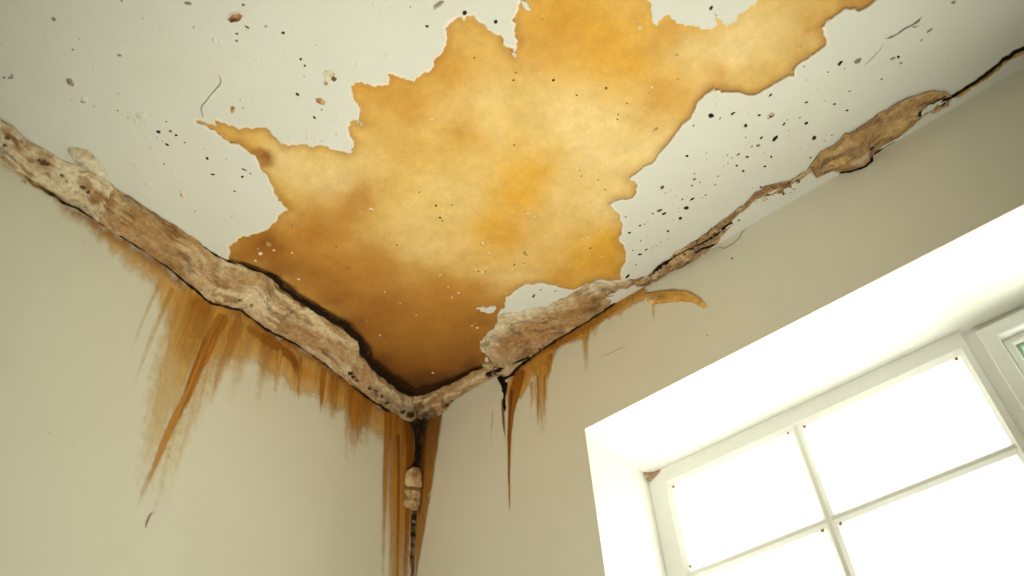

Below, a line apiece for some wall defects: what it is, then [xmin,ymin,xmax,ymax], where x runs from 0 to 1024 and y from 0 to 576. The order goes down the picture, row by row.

leakage [66,208,442,576]
crack [24,175,615,469]
spalling [0,119,813,422]
leakage [193,0,880,396]
leakage [501,288,646,509]
crack [647,219,746,278]
crack [839,142,894,174]
crack [941,47,1024,102]